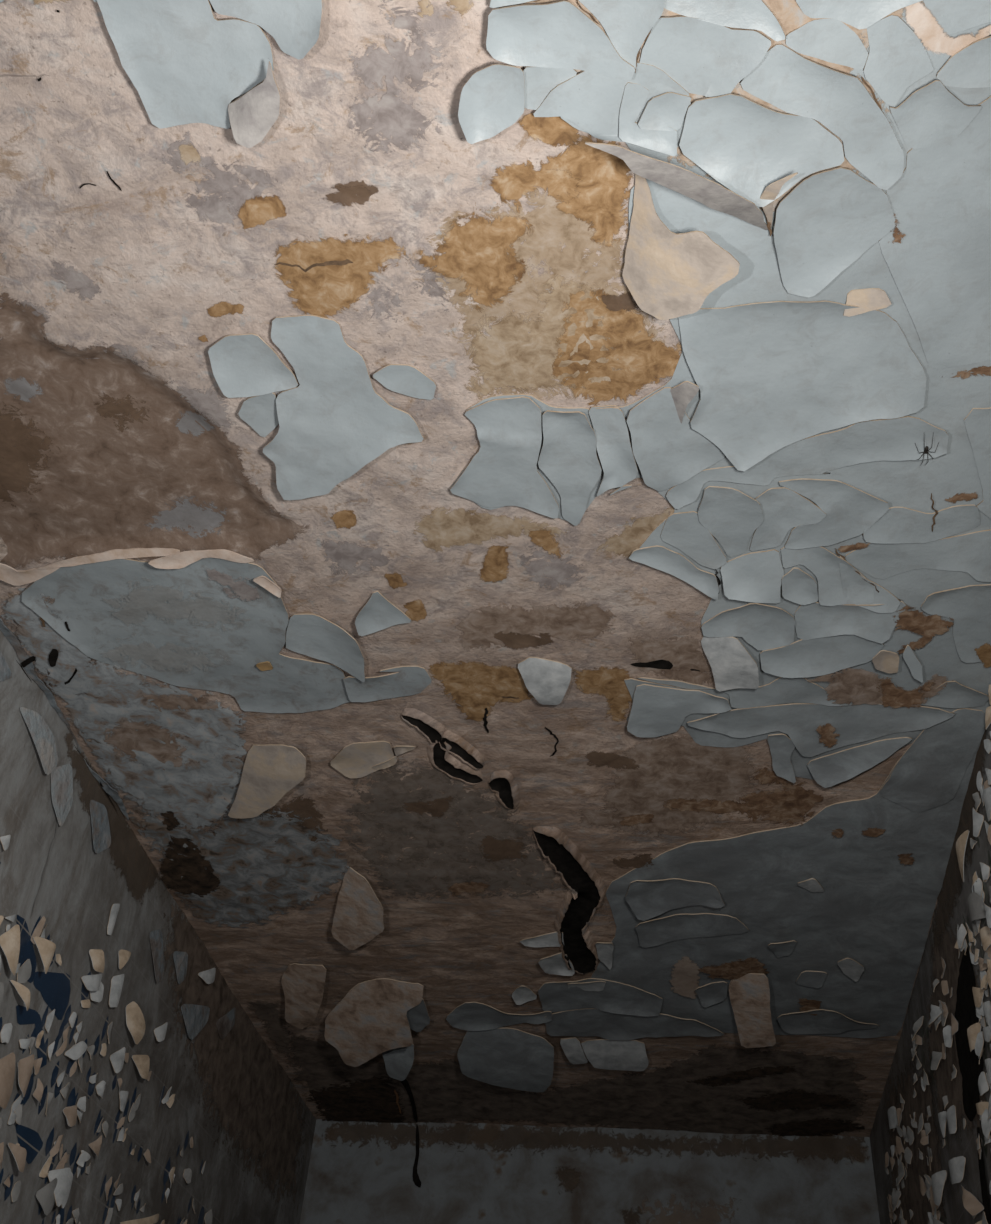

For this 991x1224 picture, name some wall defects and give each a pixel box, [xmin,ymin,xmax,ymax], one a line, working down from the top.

peeling [93,0,322,148]
damp [349,0,447,154]
damp [162,132,278,228]
corrosion [208,301,244,317]
corrosion [238,195,286,230]
corrosion [273,113,682,406]
damp [169,377,237,432]
peeling [0,293,436,950]
peeling [446,0,991,1224]
crack [401,696,607,975]
crack [394,1079,421,1188]
crack [955,947,991,1224]